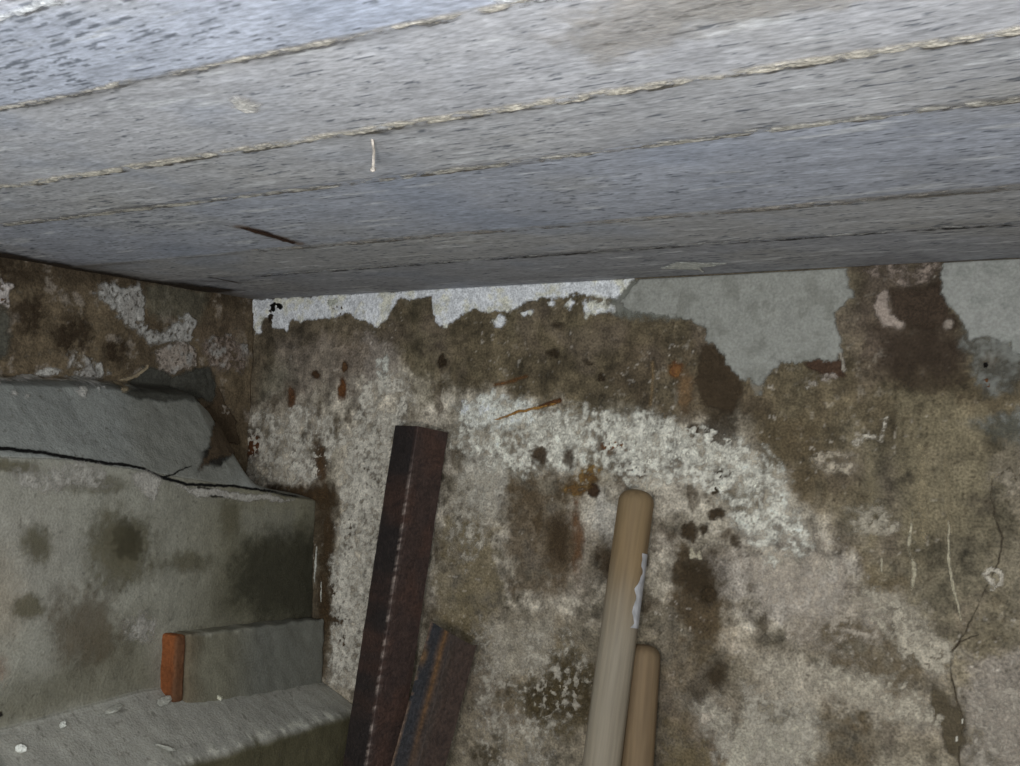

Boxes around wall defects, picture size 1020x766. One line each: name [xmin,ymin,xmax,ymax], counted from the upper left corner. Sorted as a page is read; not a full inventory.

water stain [0,253,235,293]
water stain [889,281,1020,396]
water stain [15,595,41,616]
water stain [90,511,151,585]
crack [0,447,299,498]
water stain [449,345,953,675]
crack [950,467,1017,710]
water stain [983,567,1004,591]
water stain [473,628,593,766]
water stain [707,662,727,688]
water stain [743,686,817,766]
water stain [814,661,1020,766]